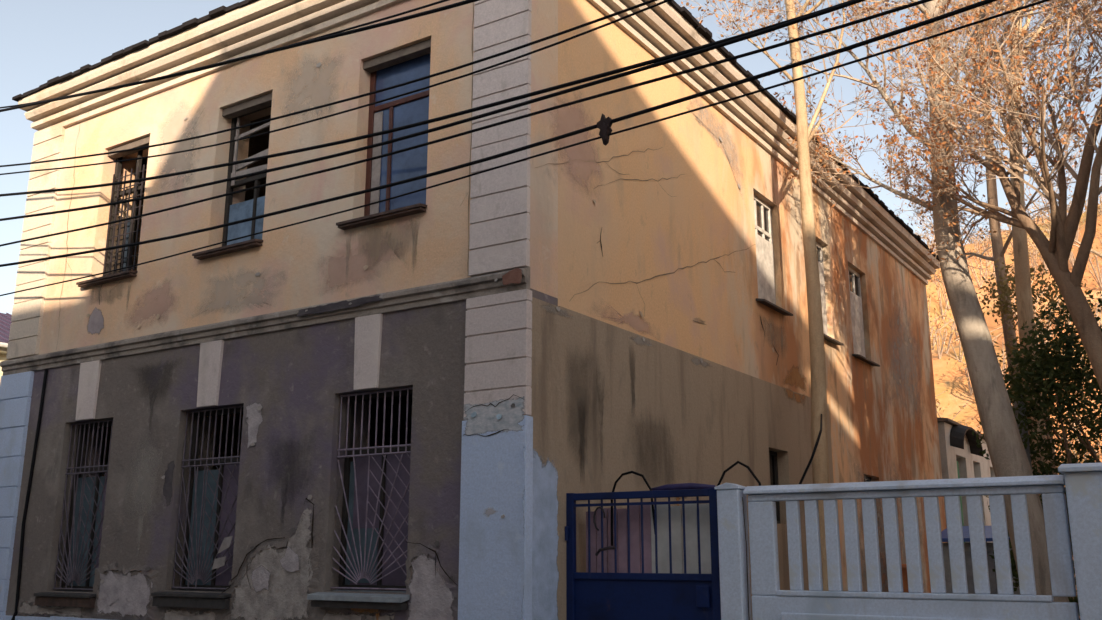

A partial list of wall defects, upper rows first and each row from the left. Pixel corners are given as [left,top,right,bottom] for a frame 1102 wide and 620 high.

crack [536,147,685,197]
crack [569,244,755,314]
peeling [245,402,263,448]
peeling [464,394,525,437]
spalling [12,495,458,620]